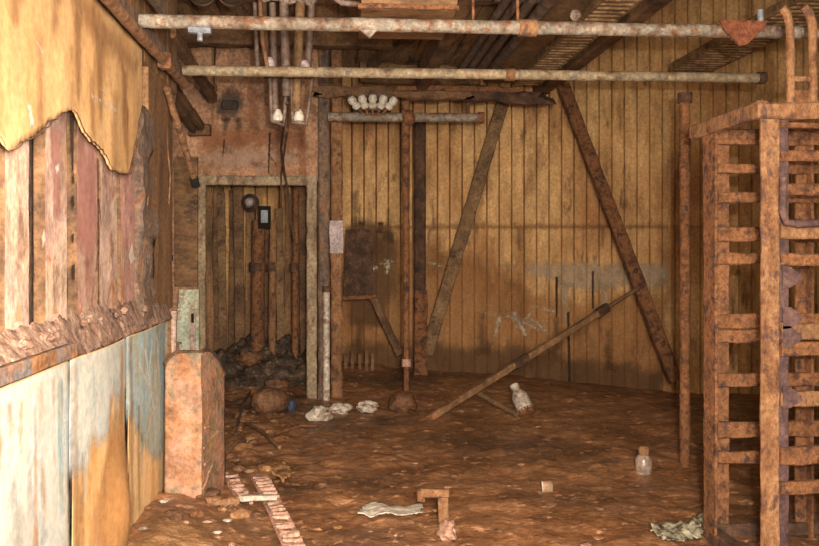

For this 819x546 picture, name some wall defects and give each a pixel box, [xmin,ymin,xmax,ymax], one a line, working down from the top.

peeling [8,110,143,214]
peeling [78,149,95,302]
peeling [0,323,165,546]